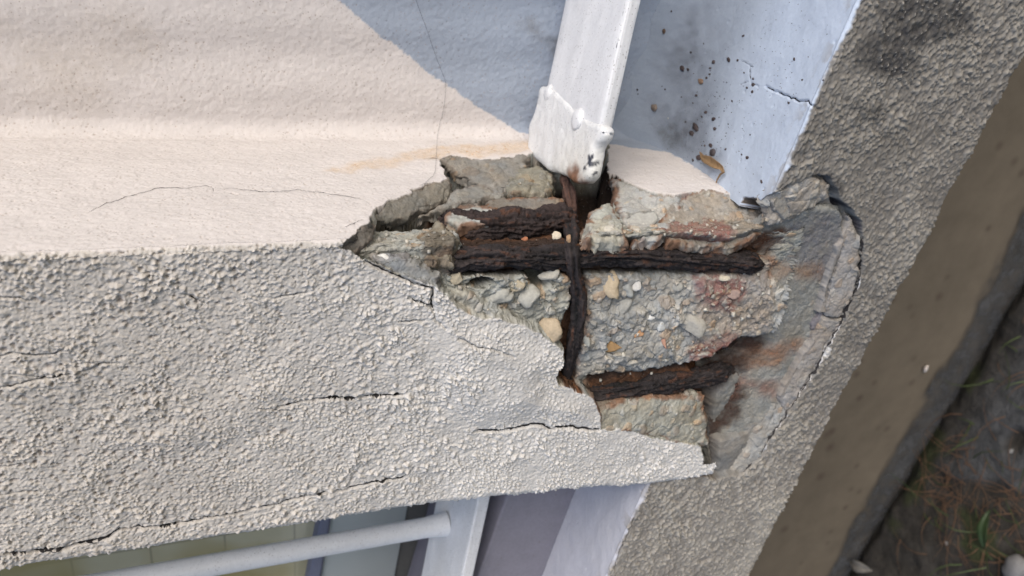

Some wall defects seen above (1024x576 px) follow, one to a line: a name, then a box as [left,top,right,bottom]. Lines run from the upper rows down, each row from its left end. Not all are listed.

crack [260,392,399,411]
crack [478,423,598,431]
spalling [341,145,862,479]
corrosion [696,336,764,435]
crack [746,238,864,469]
crack [10,467,413,555]